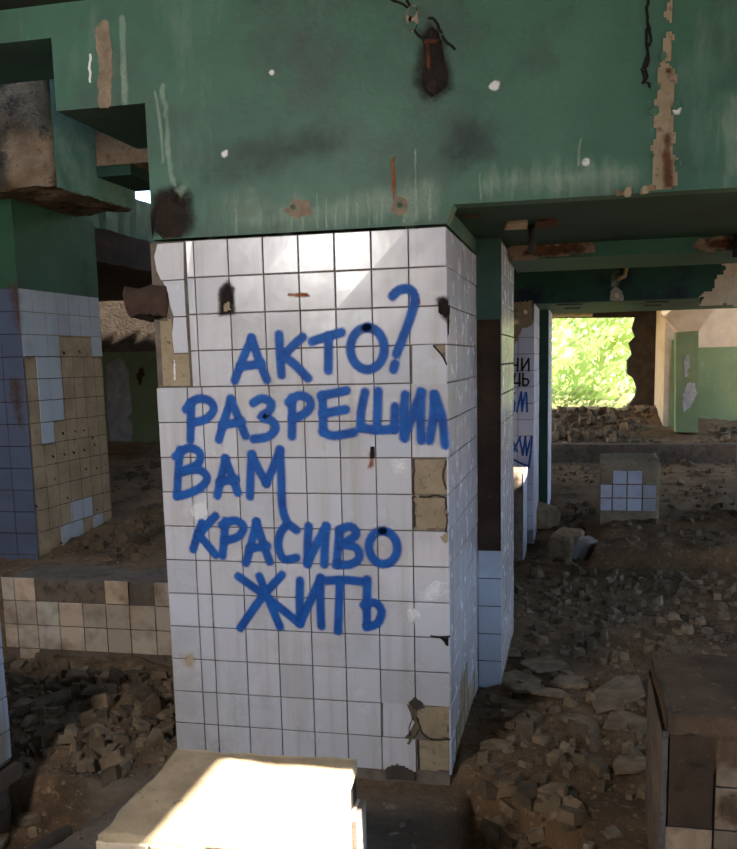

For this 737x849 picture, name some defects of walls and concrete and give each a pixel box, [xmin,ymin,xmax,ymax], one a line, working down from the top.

peeling [616,0,683,197]
spalling [0,80,131,216]
corrosion [507,242,595,261]
peeling [699,263,737,307]
spalling [160,319,191,386]
spalling [25,337,148,556]
spalling [412,459,449,543]